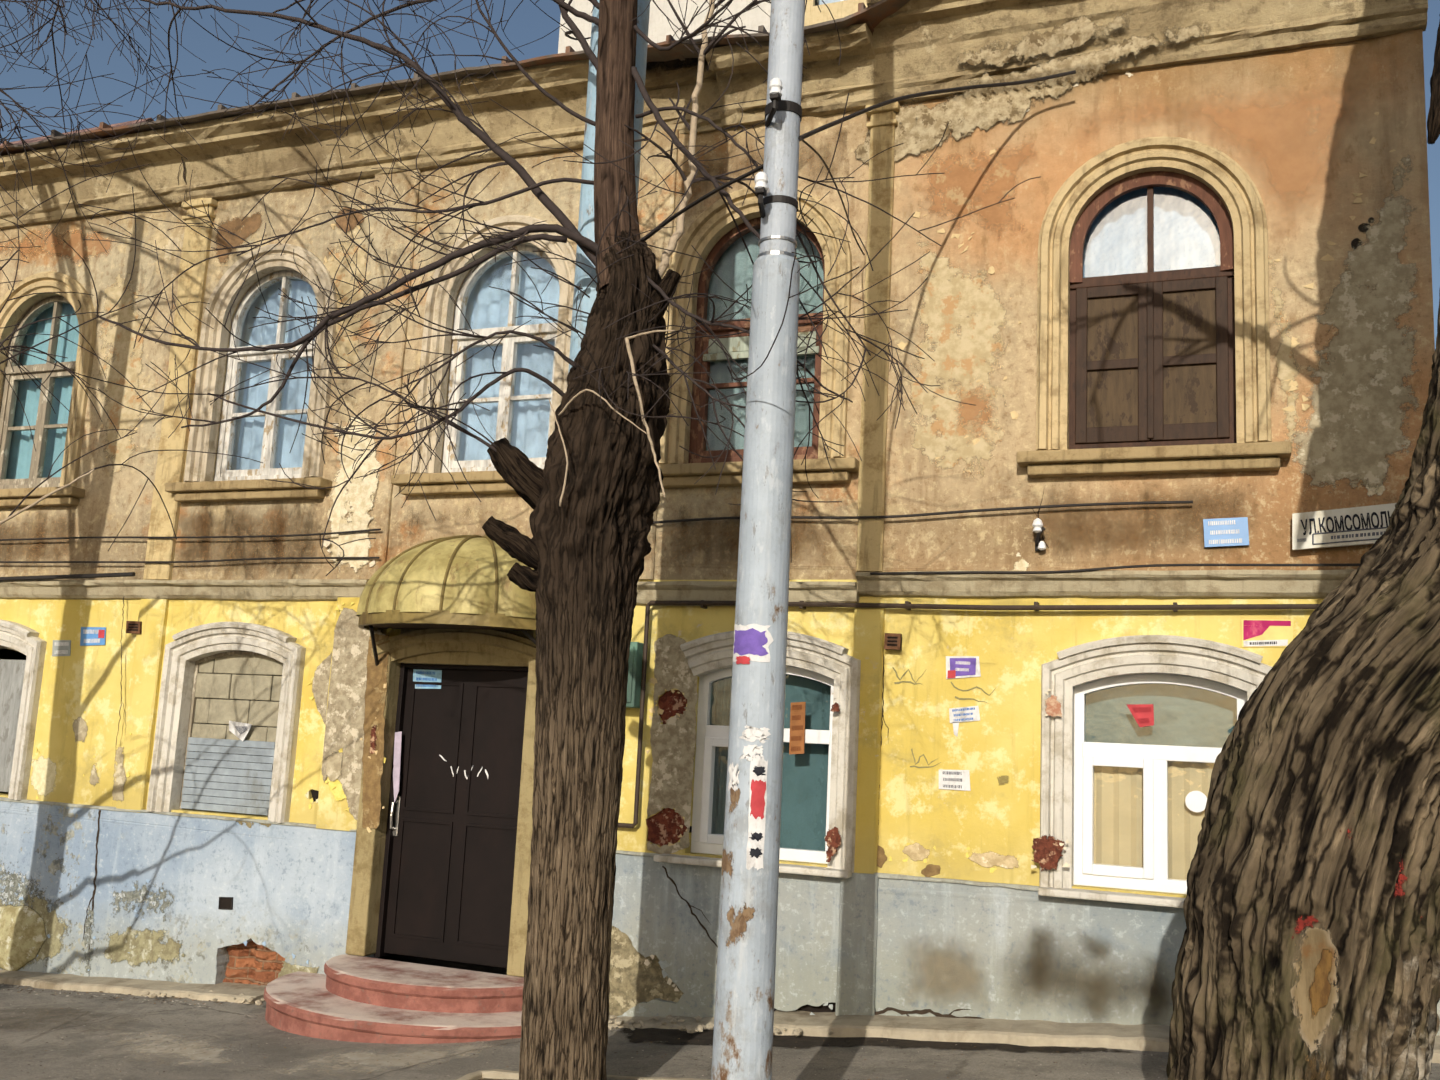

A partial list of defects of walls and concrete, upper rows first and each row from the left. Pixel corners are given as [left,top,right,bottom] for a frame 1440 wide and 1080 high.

spalling [856,130,870,165]
peeling [894,14,1209,477]
peeling [1268,137,1419,496]
crack [82,597,126,972]
peeling [305,602,391,833]
peeling [646,634,698,854]
peeling [0,861,185,973]
spalling [223,941,319,986]
spalling [609,926,684,1016]
crack [662,866,718,963]
water stain [1024,935,1162,1011]